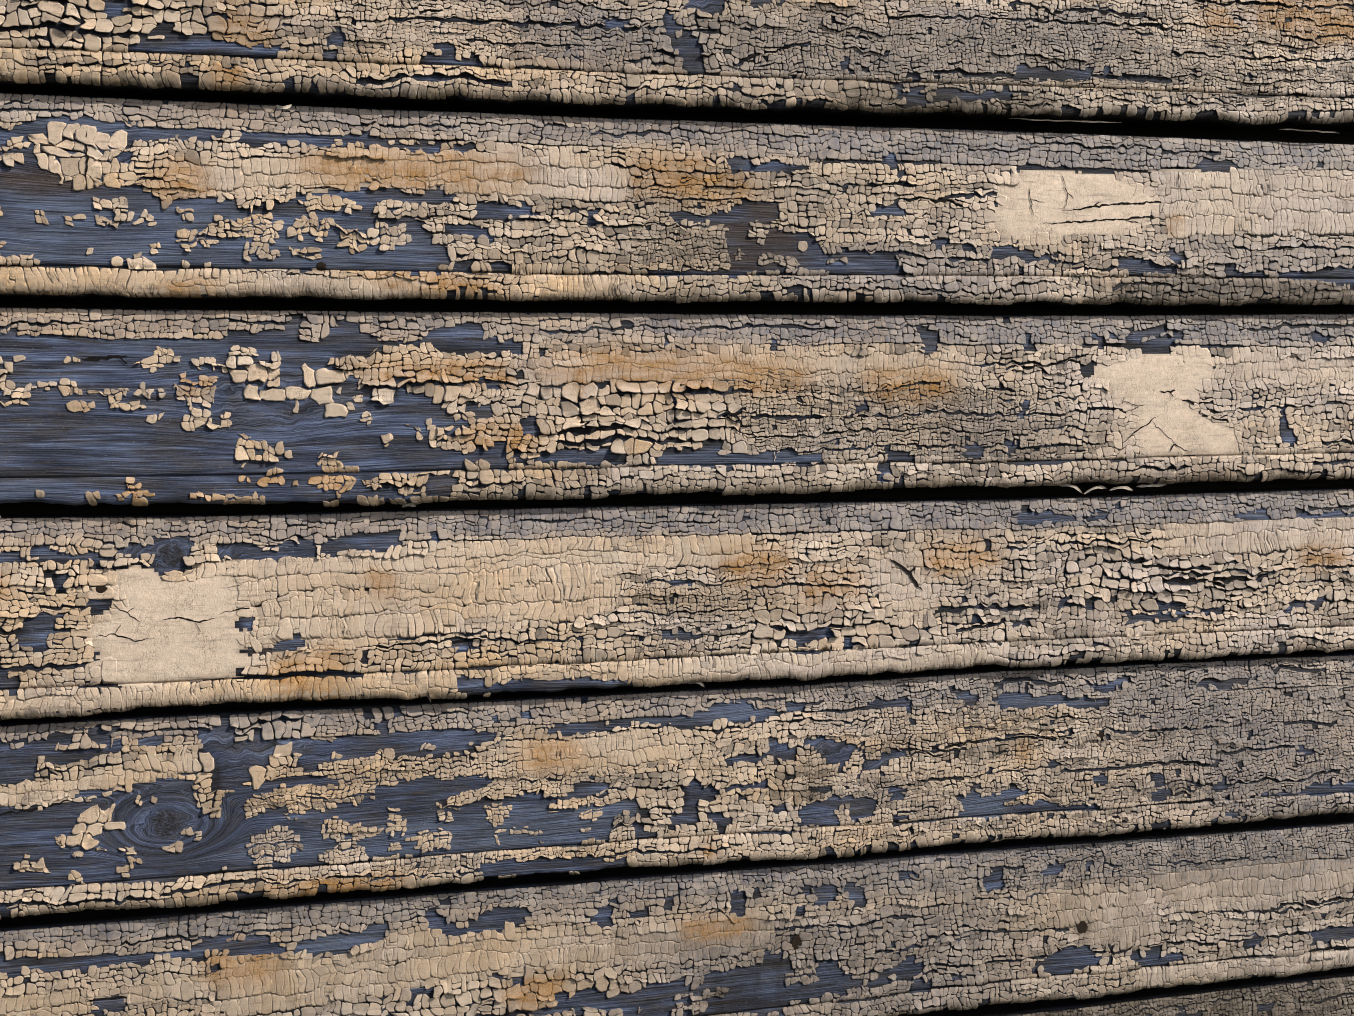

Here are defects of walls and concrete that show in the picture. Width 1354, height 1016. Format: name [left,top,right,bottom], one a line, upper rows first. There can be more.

crack [62,132,89,179]
peeling [0,110,549,283]
peeling [640,143,905,292]
crack [906,172,1209,224]
peeling [0,311,626,507]
crack [1124,390,1229,453]
peeling [0,524,448,703]
crack [94,558,575,652]
crack [890,559,923,591]
crack [1013,537,1267,585]
peeling [0,631,921,901]
peeling [486,931,975,1016]